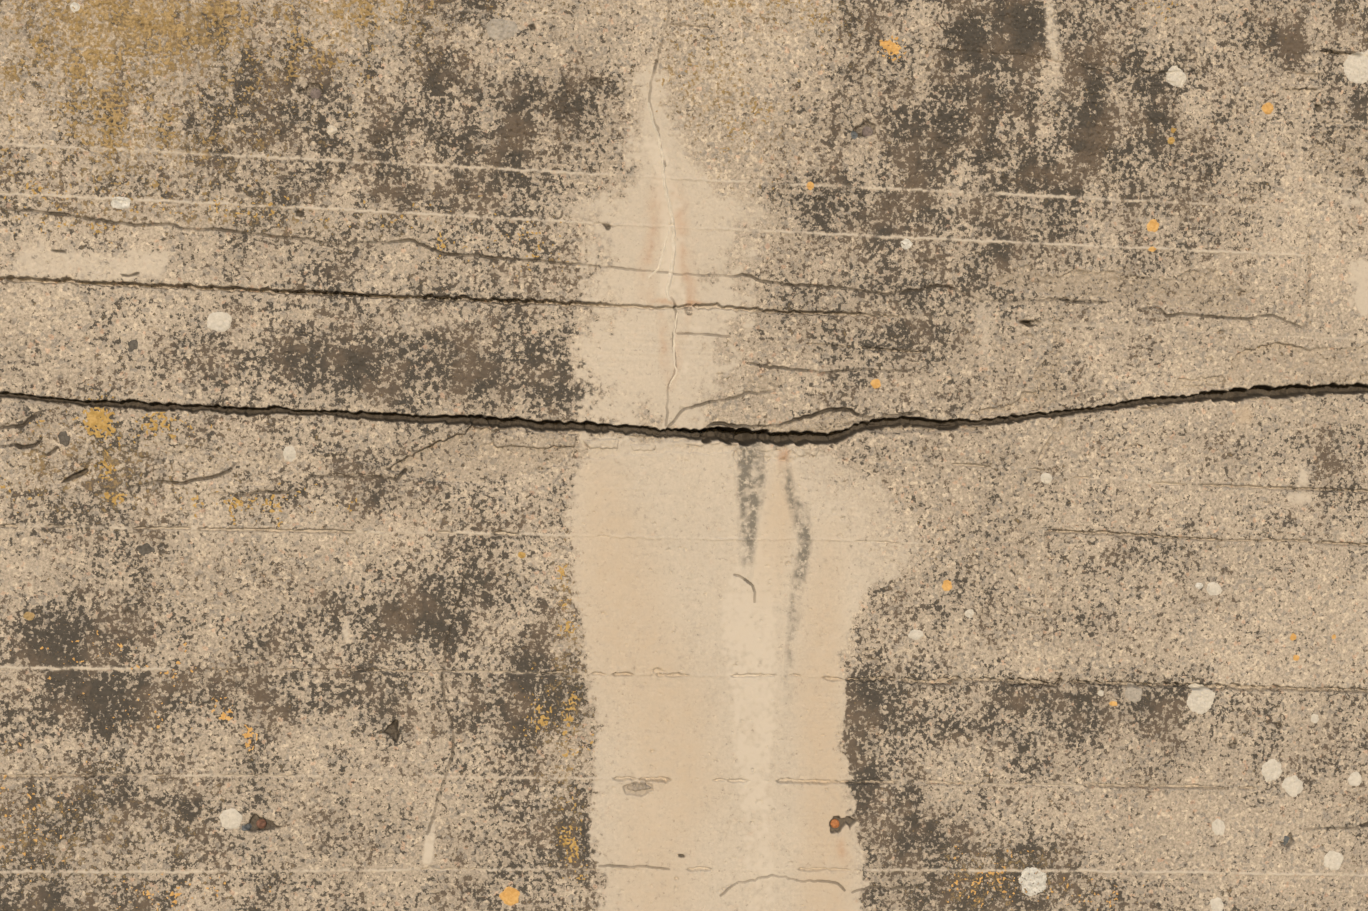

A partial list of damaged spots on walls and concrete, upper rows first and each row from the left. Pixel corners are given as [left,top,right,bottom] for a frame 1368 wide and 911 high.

crack [648,0,672,167]
water stain [1042,0,1063,106]
crack [1165,33,1197,181]
crack [0,206,1368,456]
water stain [545,53,930,911]
water stain [342,615,351,645]
crack [425,537,480,836]